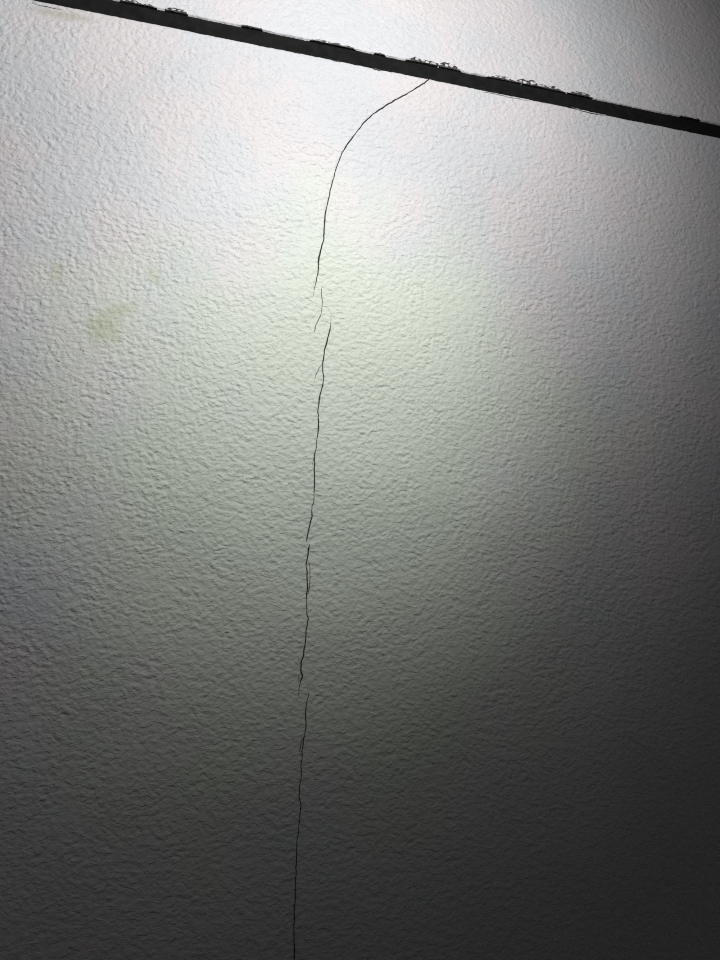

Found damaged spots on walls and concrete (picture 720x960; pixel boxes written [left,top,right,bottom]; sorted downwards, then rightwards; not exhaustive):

crack [293,79,429,960]